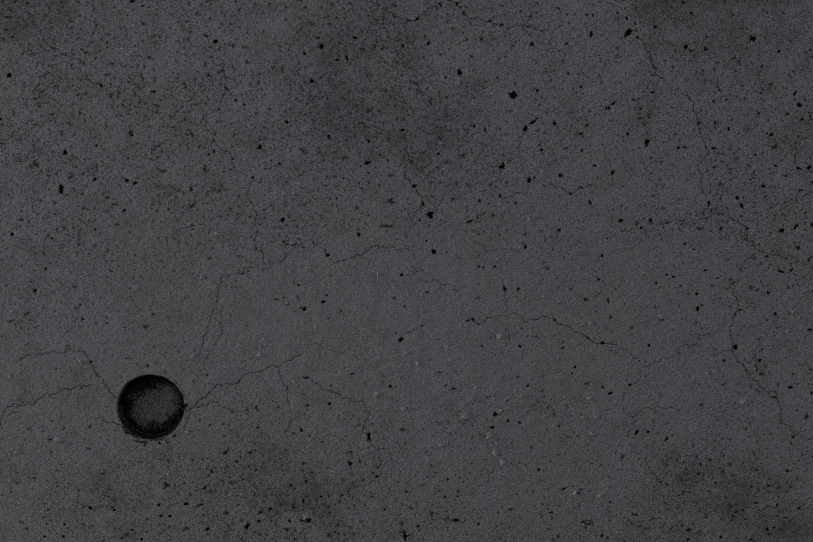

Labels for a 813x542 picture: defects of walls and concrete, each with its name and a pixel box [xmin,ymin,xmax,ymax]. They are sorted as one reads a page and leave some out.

crack [26,0,142,117]
crack [376,0,562,32]
crack [187,61,457,432]
crack [468,29,812,448]
crack [0,348,117,429]